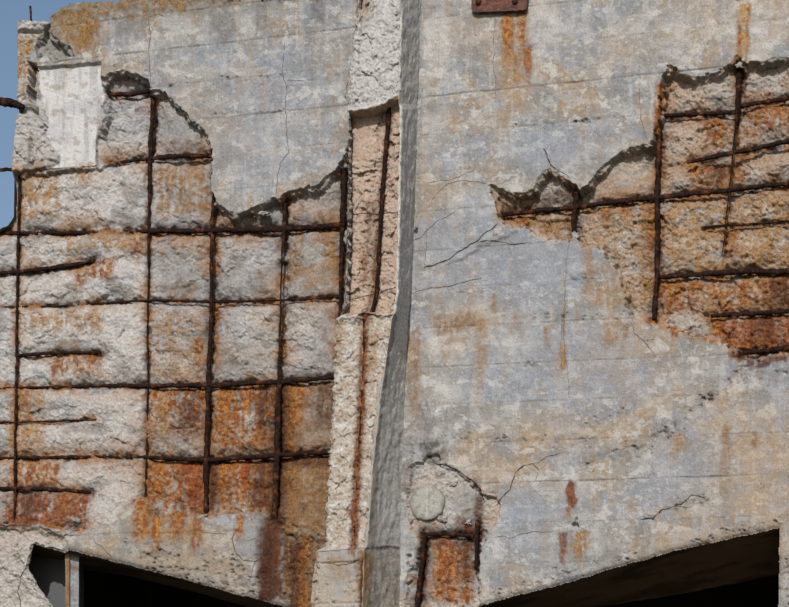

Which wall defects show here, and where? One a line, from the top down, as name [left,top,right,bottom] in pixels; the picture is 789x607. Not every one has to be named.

rust [501,10,531,81]
rust [704,105,789,146]
crack [416,169,527,268]
spalling [488,54,789,363]
spalling [0,0,503,607]
crack [345,277,482,300]
rust [661,197,789,367]
rust [133,382,330,607]
rust [349,315,373,601]
crack [426,454,557,508]
rust [566,481,577,516]
rust [559,530,587,562]